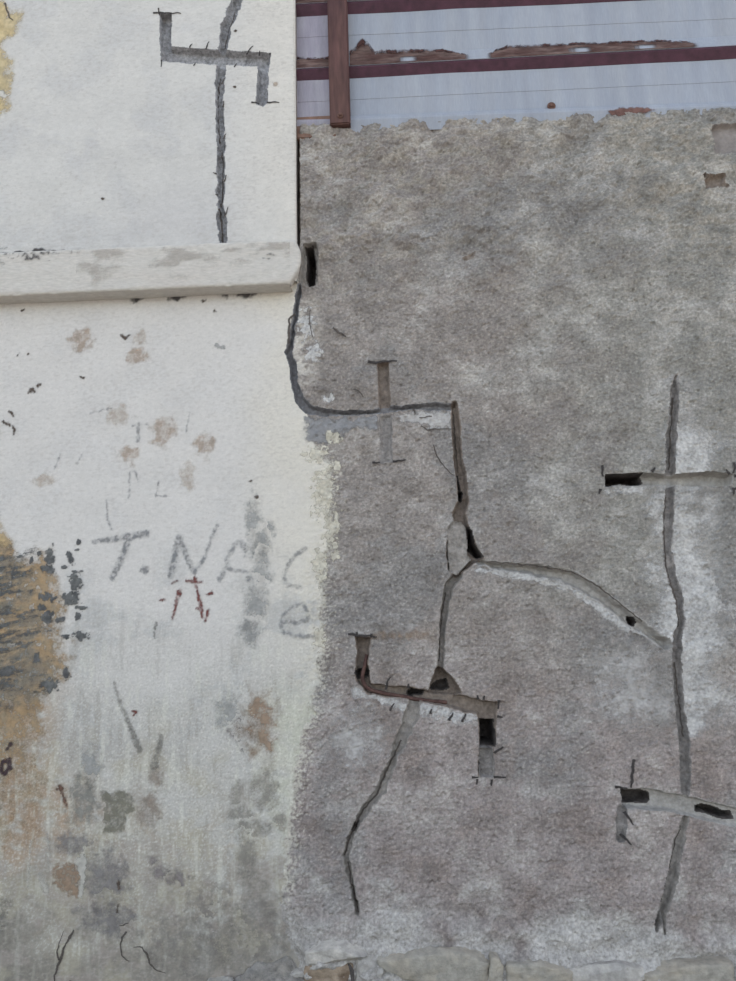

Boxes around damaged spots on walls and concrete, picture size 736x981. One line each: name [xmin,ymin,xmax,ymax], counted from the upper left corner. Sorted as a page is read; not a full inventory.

peeling [0,1,23,114]
corrosion [296,57,329,68]
corrosion [350,39,467,65]
corrosion [489,39,696,58]
crack [213,0,243,243]
crack [284,283,692,935]
peeling [0,533,90,792]
water stain [217,697,276,755]
water stain [73,753,155,832]
water stain [229,785,283,876]